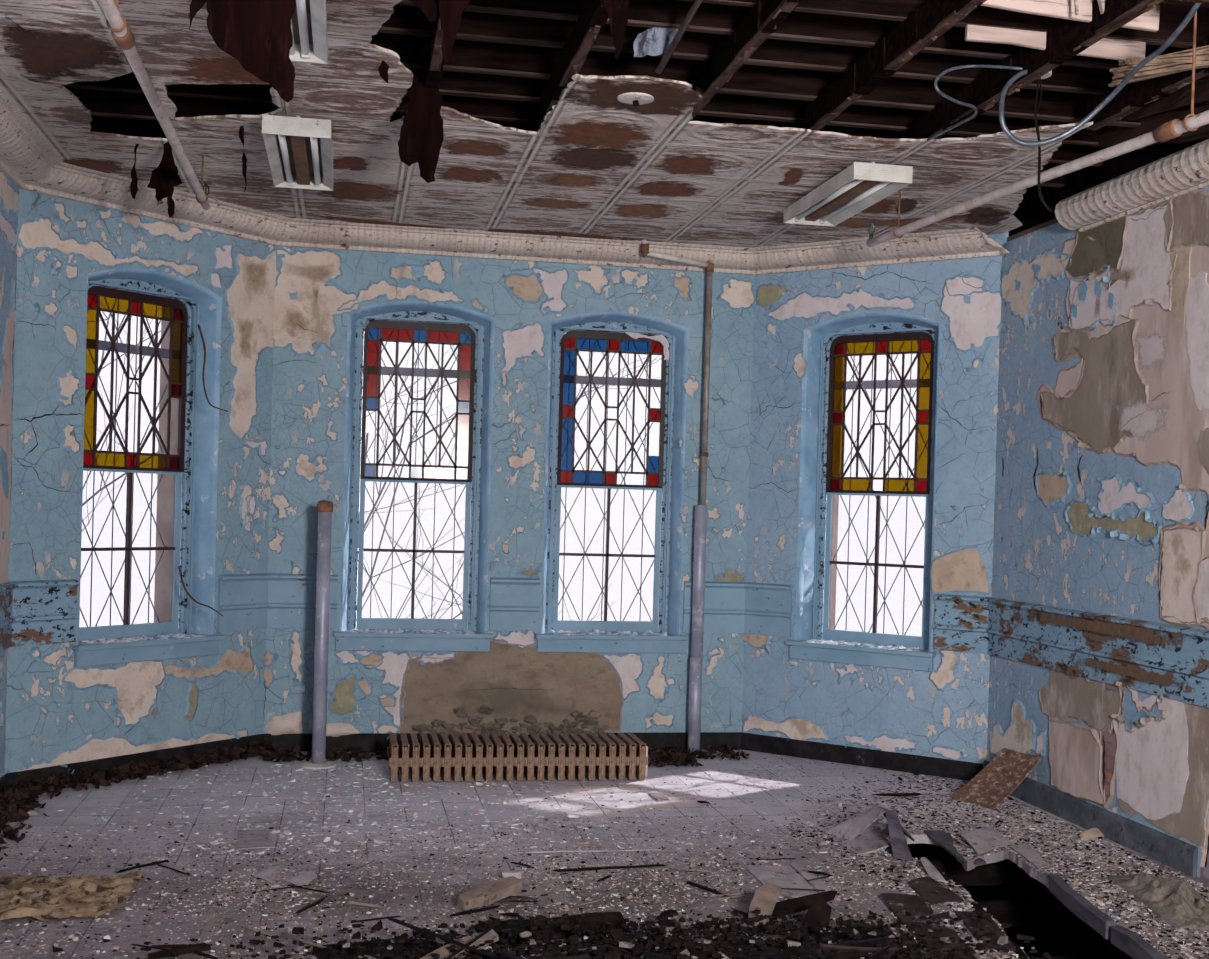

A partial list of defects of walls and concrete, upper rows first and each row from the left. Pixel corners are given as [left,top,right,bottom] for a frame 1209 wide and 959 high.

peeling [0,170,490,457]
crack [829,266,930,296]
peeling [0,277,16,584]
crack [0,280,83,498]
peeling [277,373,349,483]
crack [936,395,980,470]
flaking render [930,190,1209,650]
peeling [226,479,302,574]
peeling [0,630,305,777]
flaking render [328,629,684,740]
flaking render [990,654,1209,846]